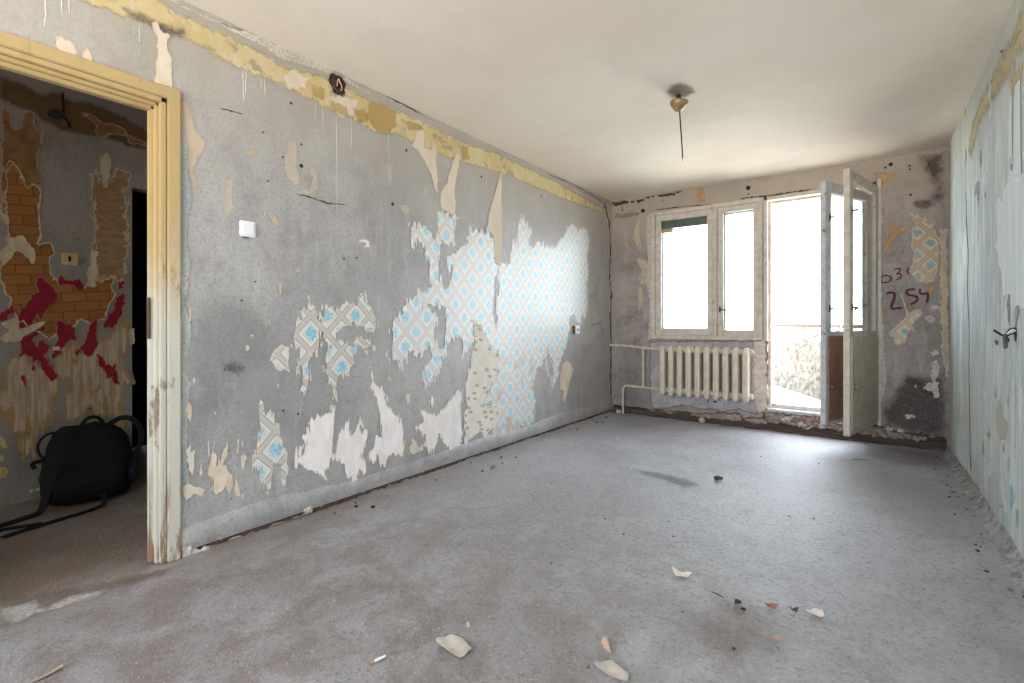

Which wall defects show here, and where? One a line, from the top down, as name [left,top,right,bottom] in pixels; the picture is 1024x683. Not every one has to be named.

peeling [332,95,358,118]
damp [926,155,943,199]
peeling [64,318,136,431]
peeling [181,124,209,557]
peeling [914,228,949,398]
peeling [17,431,36,463]
spalling [649,400,929,442]
damp [885,377,947,448]
peeling [996,396,1009,441]
flaking render [944,446,1024,596]